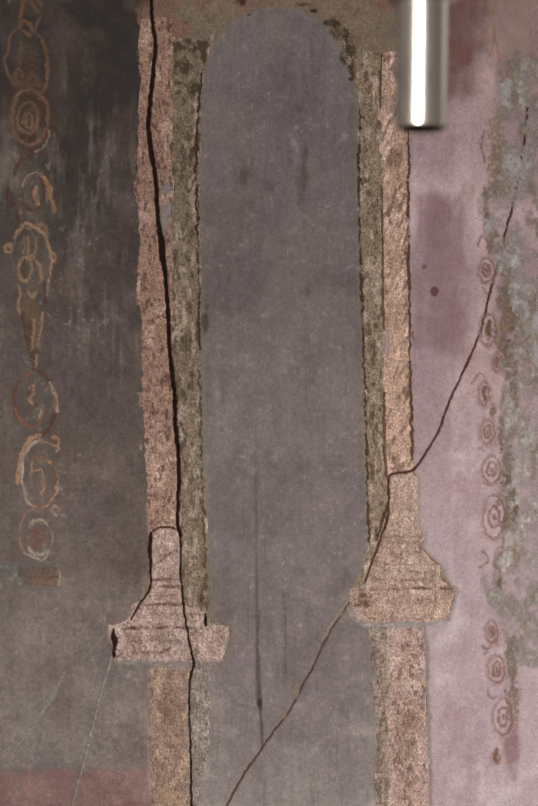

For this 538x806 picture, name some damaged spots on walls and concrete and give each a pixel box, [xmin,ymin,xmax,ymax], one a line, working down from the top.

crack [146,0,195,806]
flaking render [131,34,214,630]
flaking render [406,132,414,460]
crack [365,261,498,583]
crack [503,187,517,243]
crack [521,107,529,159]
crack [72,635,118,806]
flaking render [186,661,211,806]
crack [225,602,348,806]
flaking render [368,623,390,806]